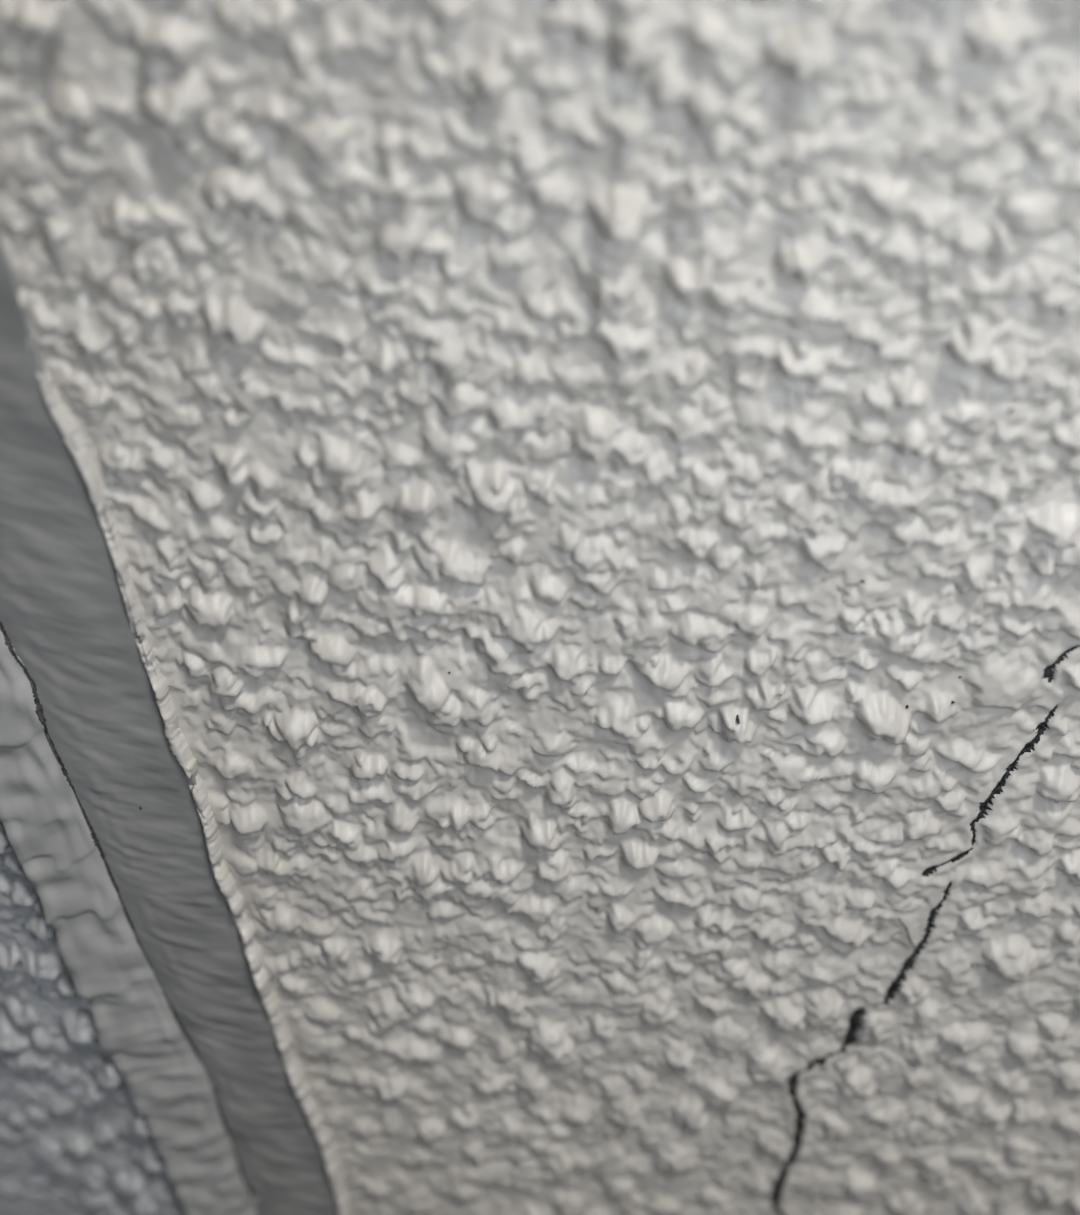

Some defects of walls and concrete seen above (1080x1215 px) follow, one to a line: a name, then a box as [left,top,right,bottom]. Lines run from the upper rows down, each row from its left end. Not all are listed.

crack [769,645,1080,1215]